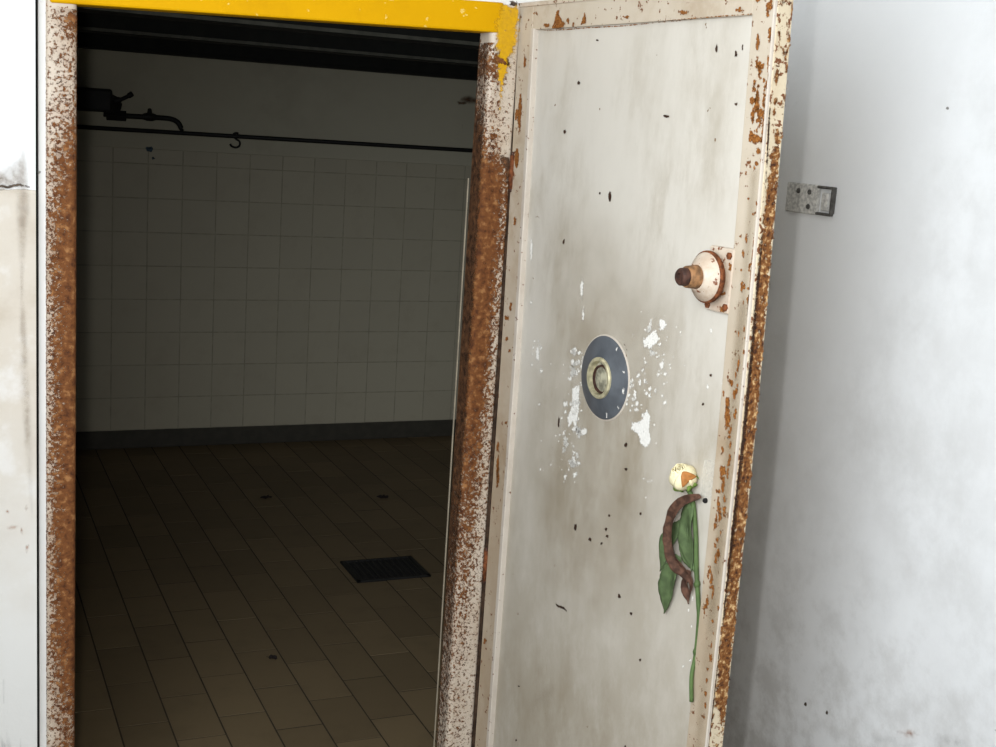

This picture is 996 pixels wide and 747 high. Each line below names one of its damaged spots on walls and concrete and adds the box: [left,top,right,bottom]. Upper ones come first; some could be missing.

rust [533,7,752,31]
crack [0,181,28,189]
rust [45,8,77,747]
rust [436,42,526,747]
peeling [531,339,587,483]
peeling [617,311,681,447]
rust [703,0,793,747]